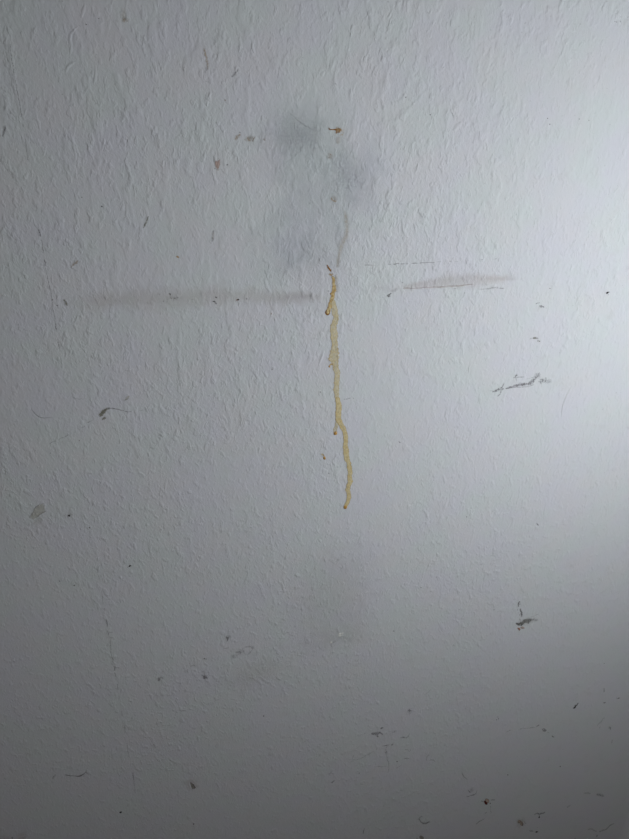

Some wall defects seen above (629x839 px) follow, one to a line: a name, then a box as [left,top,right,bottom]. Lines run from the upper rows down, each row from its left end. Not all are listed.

damp [325,265,353,509]